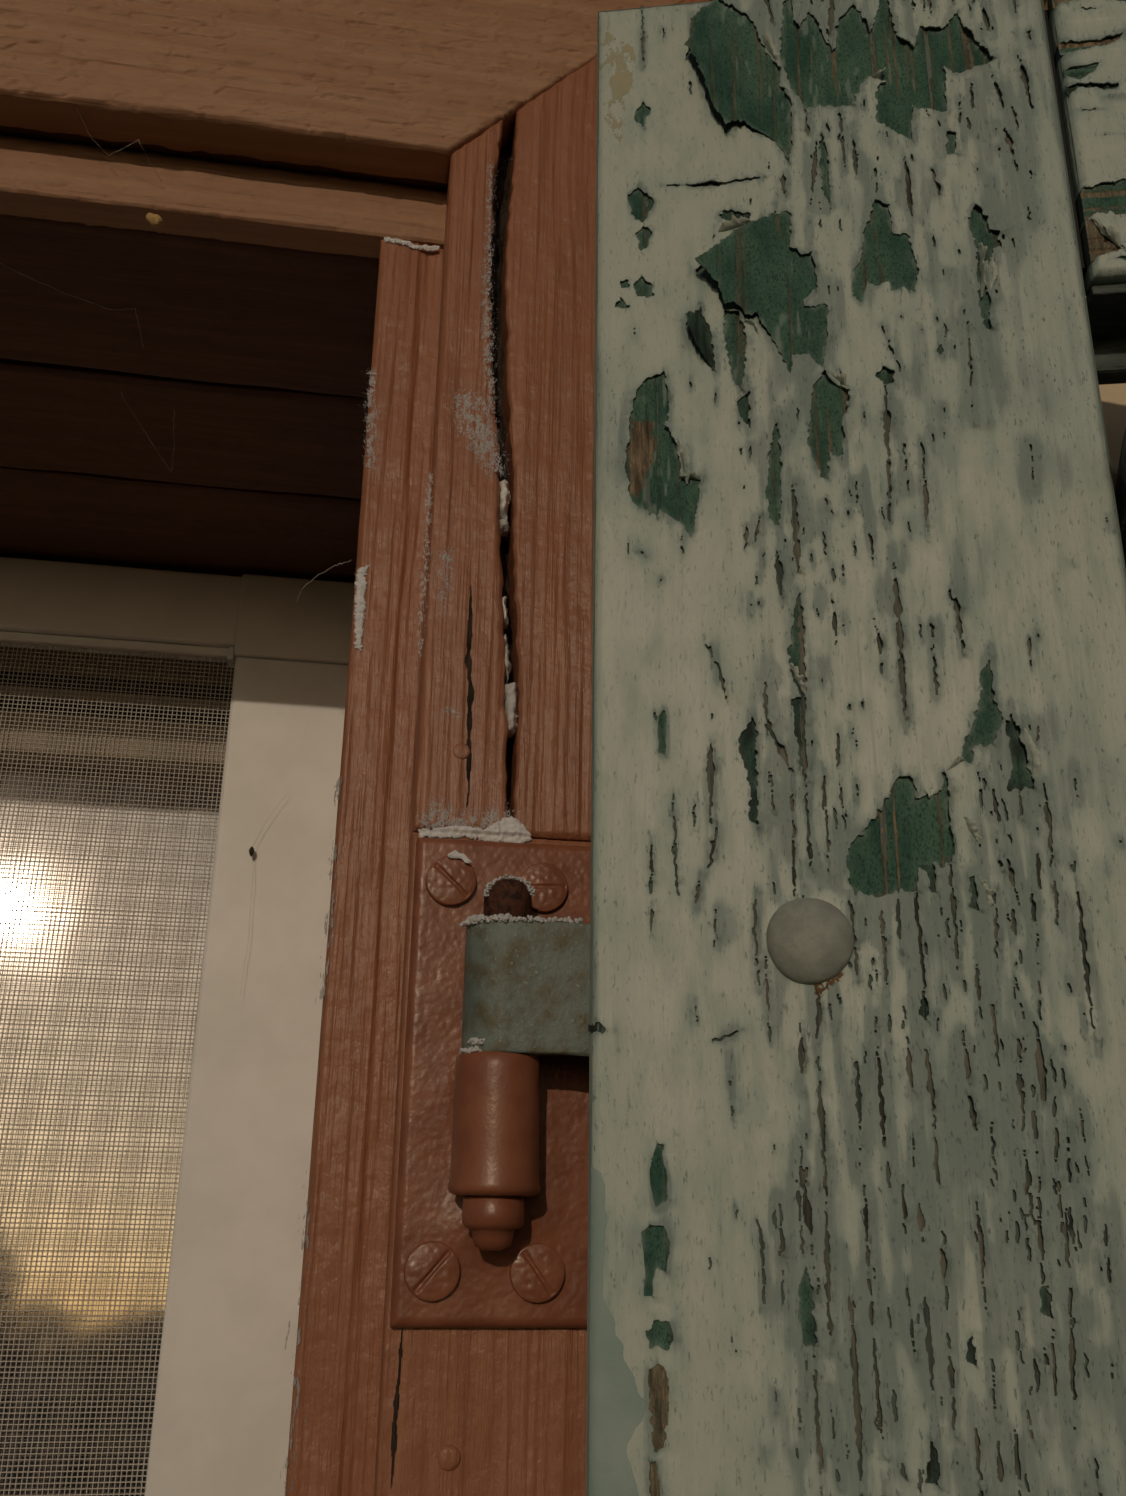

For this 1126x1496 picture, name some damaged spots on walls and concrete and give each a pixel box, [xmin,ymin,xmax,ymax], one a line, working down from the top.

peeling [684,0,999,164]
peeling [1053,32,1126,102]
peeling [615,181,659,309]
peeling [852,198,921,304]
peeling [1074,177,1126,262]
peeling [685,204,859,526]
crack [464,157,518,817]
peeling [625,367,701,535]
peeling [738,710,767,831]
peeling [846,651,1042,911]
peeling [641,1139,681,1496]
crack [390,1328,403,1489]